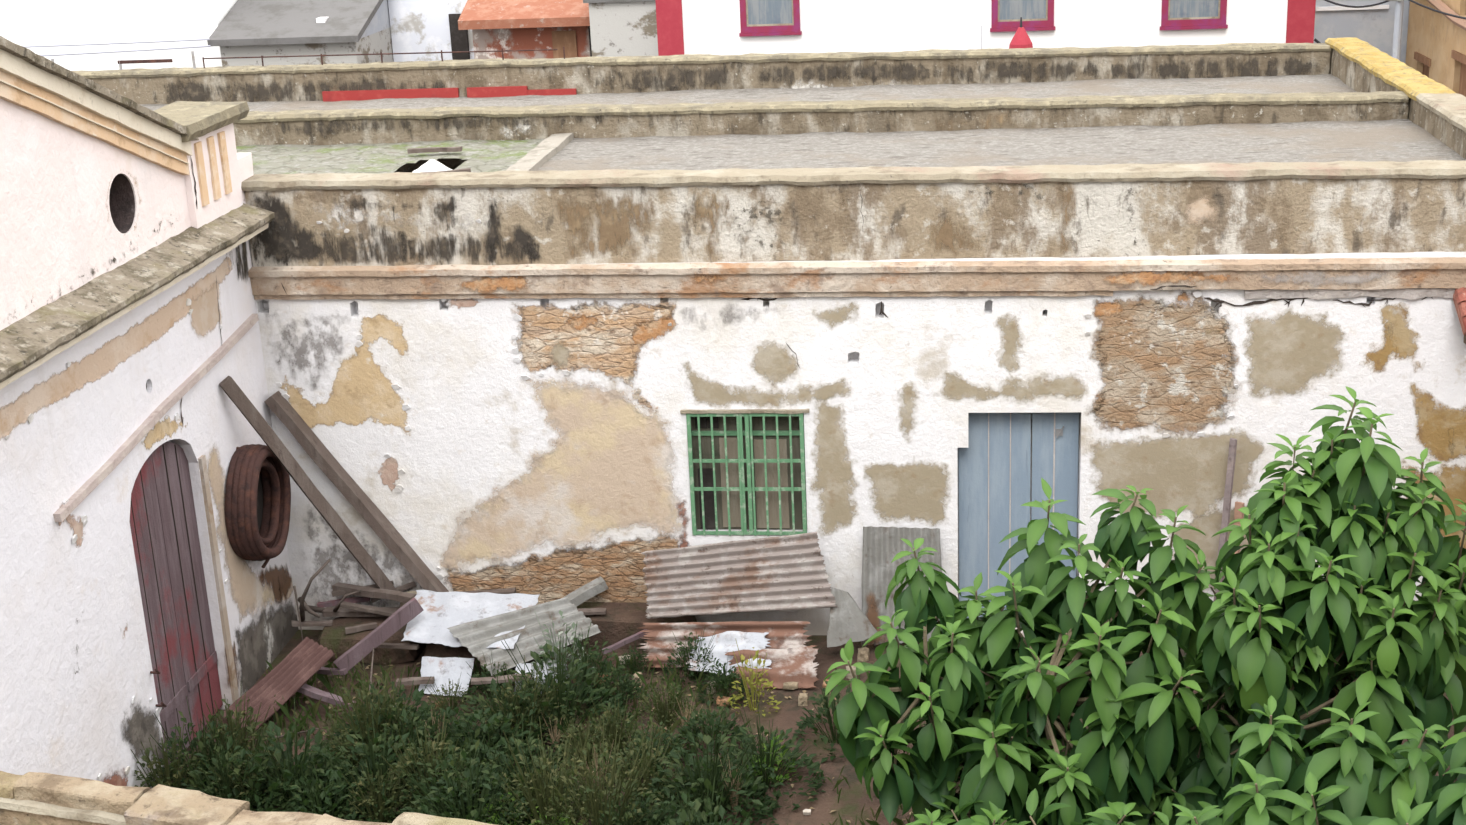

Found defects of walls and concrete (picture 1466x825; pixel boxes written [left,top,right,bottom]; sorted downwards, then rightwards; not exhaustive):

leakage [167,78,445,104]
leakage [614,63,728,92]
leakage [760,57,1312,89]
leakage [226,194,539,279]
peeling [276,314,411,432]
spalling [378,454,405,493]
peeling [436,276,688,605]
spalling [943,271,1344,589]
spalling [97,696,166,786]